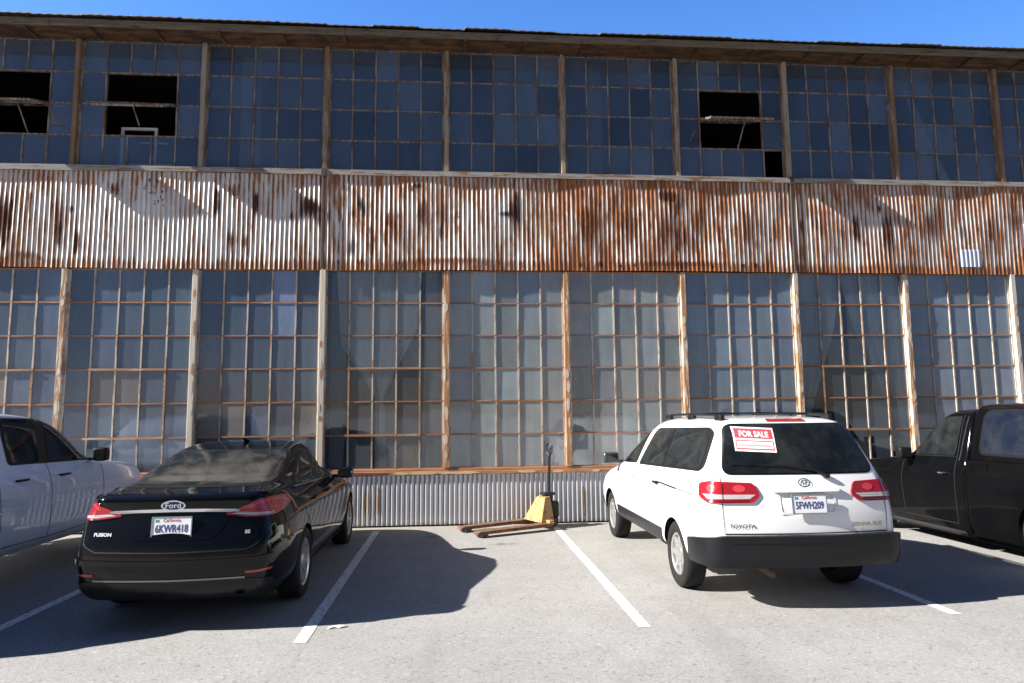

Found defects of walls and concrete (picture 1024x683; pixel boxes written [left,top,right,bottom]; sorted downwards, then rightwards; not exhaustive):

rust [0,198,40,260]
rust [54,205,79,253]
rust [213,184,240,218]
rust [227,233,248,256]
rust [290,196,320,226]
rust [357,197,502,265]
rust [510,193,520,225]
rust [531,210,556,240]
rust [573,189,721,268]
rust [715,200,757,268]
rust [800,202,839,261]
rust [878,206,894,262]